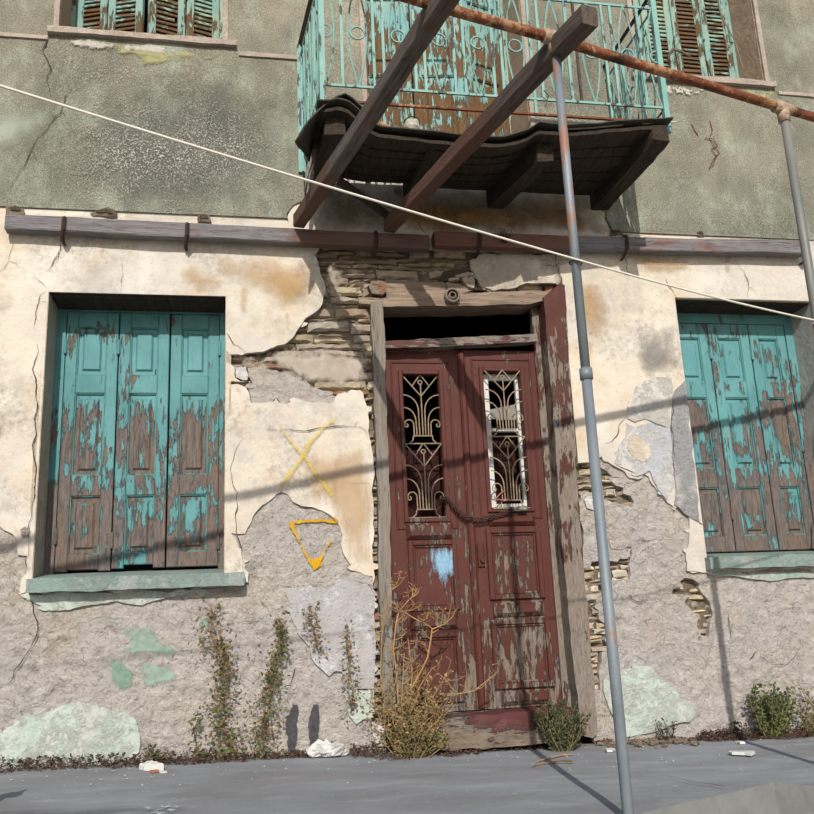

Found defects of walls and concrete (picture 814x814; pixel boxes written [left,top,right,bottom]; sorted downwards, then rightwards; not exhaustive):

crack [10,34,75,187]
flaking render [231,248,571,419]
crack [1,594,43,687]
flaking render [0,431,389,769]
flaking render [576,463,615,744]
flaking render [600,376,814,742]